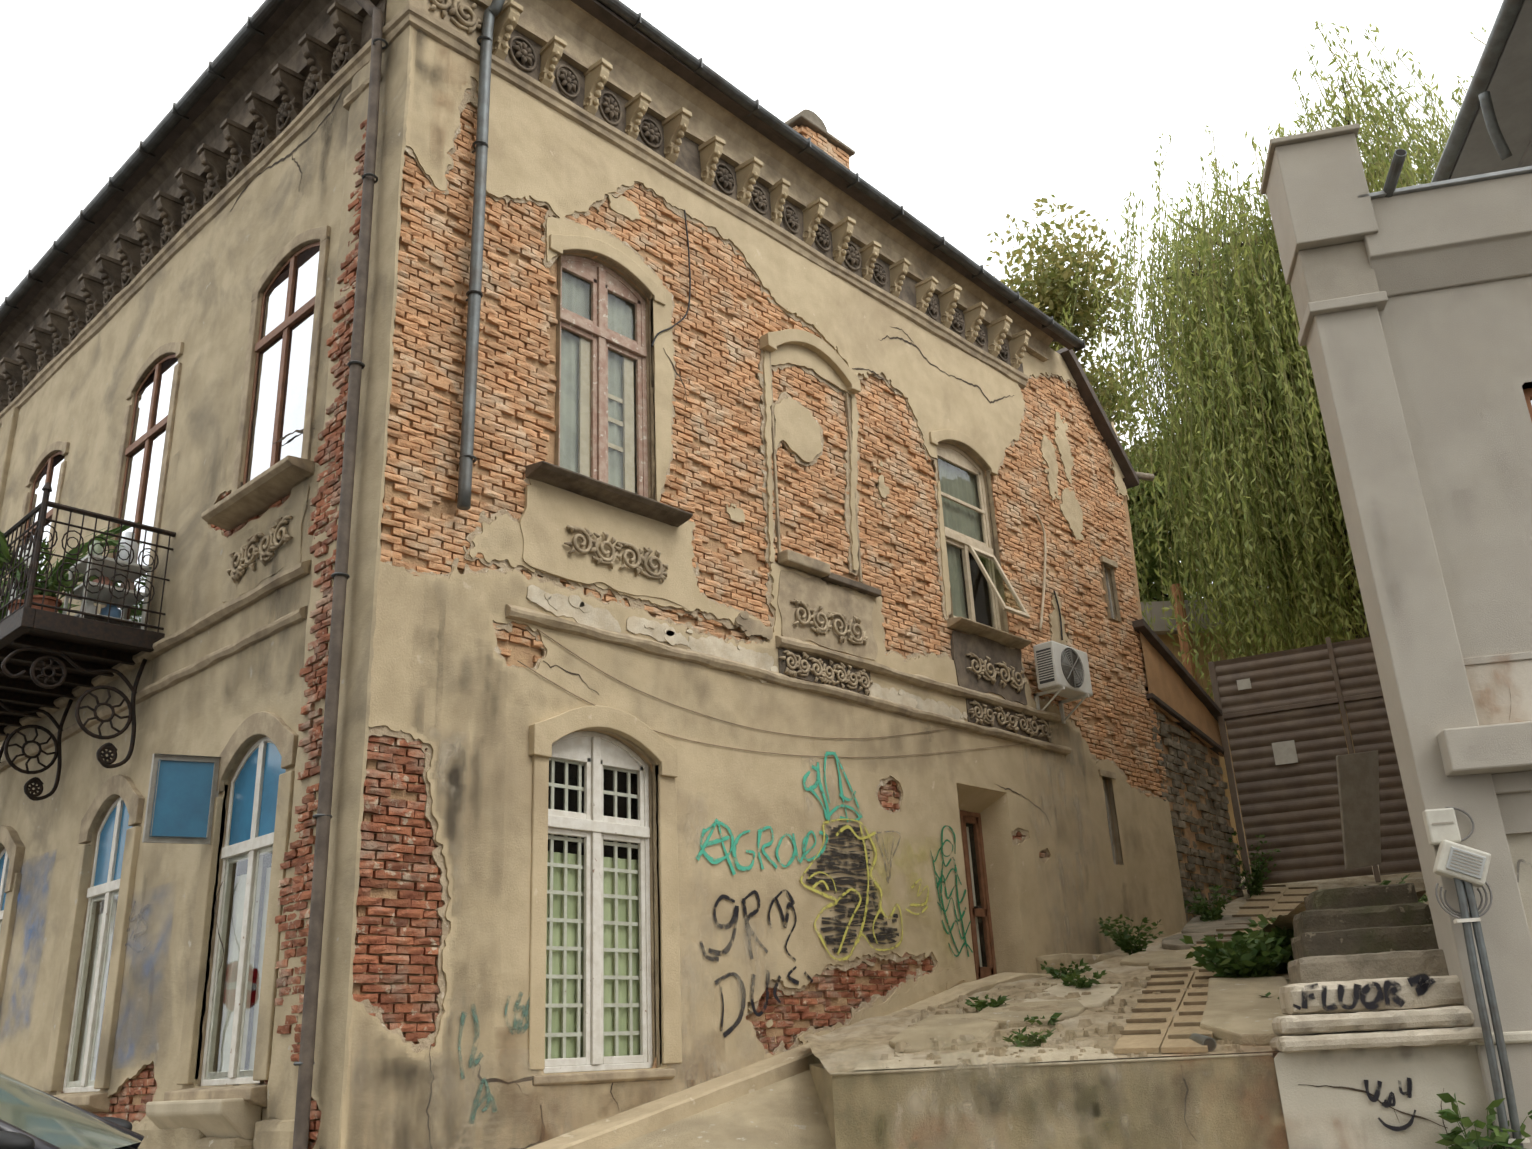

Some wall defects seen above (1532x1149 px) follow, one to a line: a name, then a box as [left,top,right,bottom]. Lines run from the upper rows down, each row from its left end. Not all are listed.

flaking render [380,91,969,683]
crack [852,326,1014,404]
flaking render [210,494,291,537]
flaking render [275,119,367,1062]
flaking render [991,375,1168,800]
peeling [867,682,967,721]
water stain [440,744,459,800]
flaking render [878,780,900,812]
flaking render [353,735,444,1047]
flaking render [745,952,966,1063]
flaking render [91,1064,157,1123]